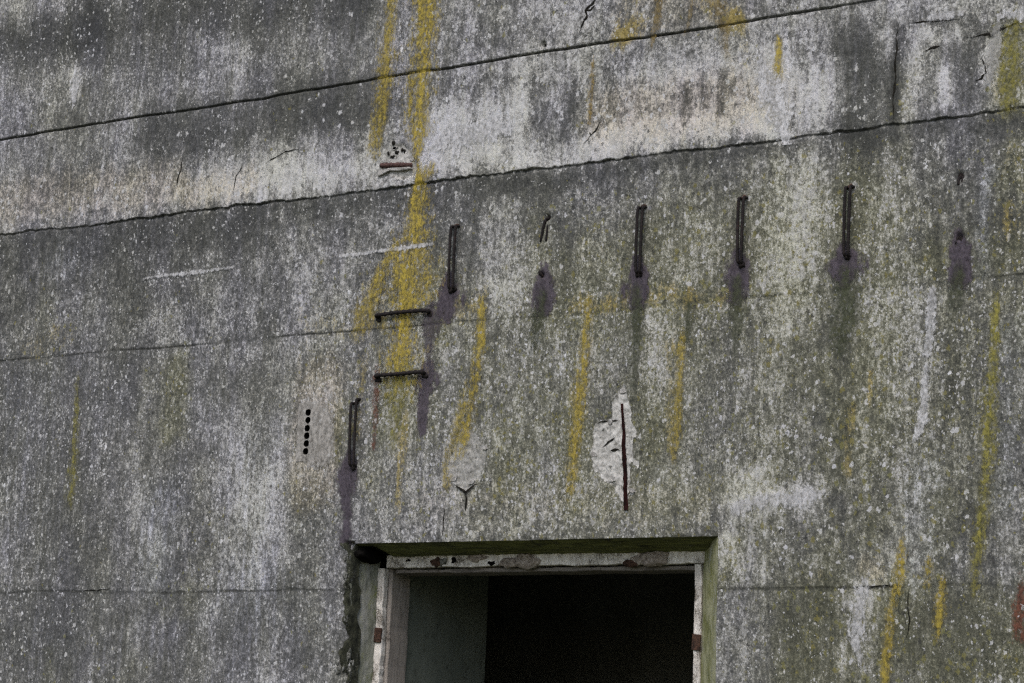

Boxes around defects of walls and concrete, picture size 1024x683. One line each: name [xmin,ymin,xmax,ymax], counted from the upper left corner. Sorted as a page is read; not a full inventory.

crack [2,0,837,141]
crack [819,19,953,135]
crack [583,122,635,164]
spalling [590,384,642,510]
corrosion [1011,582,1024,641]